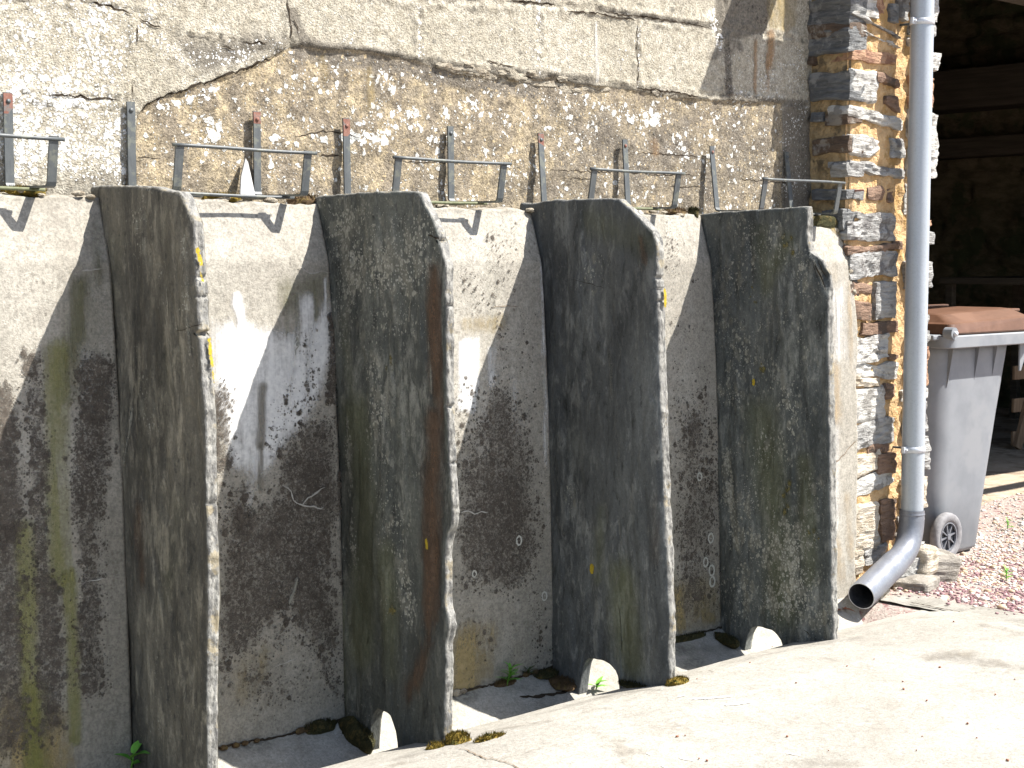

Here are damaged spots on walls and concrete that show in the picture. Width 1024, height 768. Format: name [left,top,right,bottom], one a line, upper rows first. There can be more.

crack [48,83,134,101]
damp [0,281,133,768]
damp [212,279,345,722]
rust [423,268,443,631]
damp [453,222,553,666]